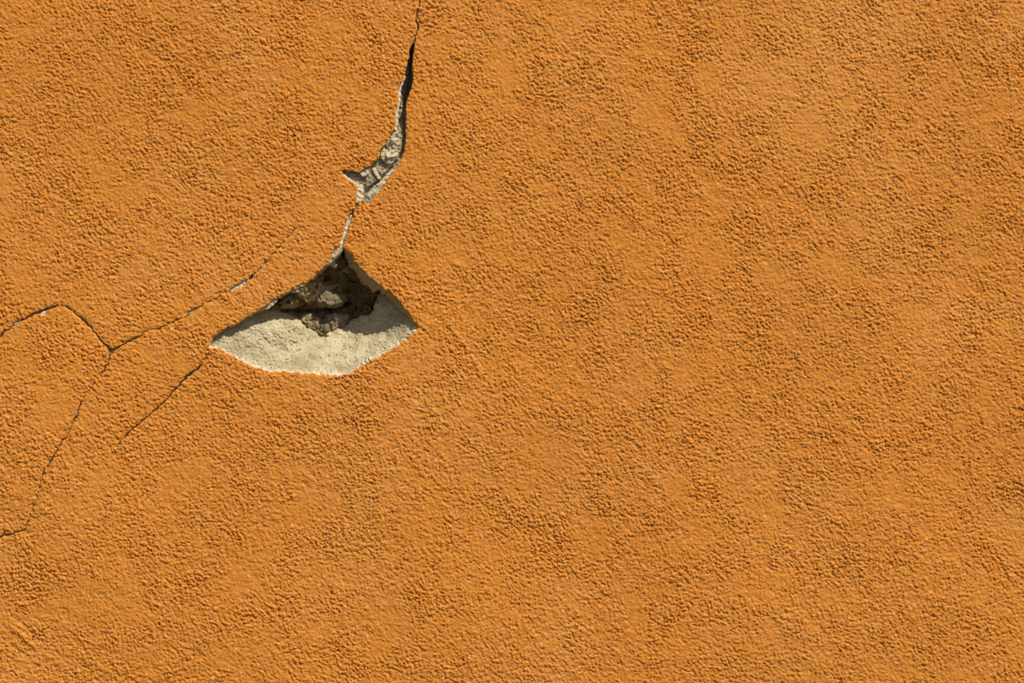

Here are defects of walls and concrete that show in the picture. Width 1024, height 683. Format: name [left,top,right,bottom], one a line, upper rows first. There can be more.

crack [339,0,421,248]
crack [0,227,296,538]
flaking render [209,246,420,376]